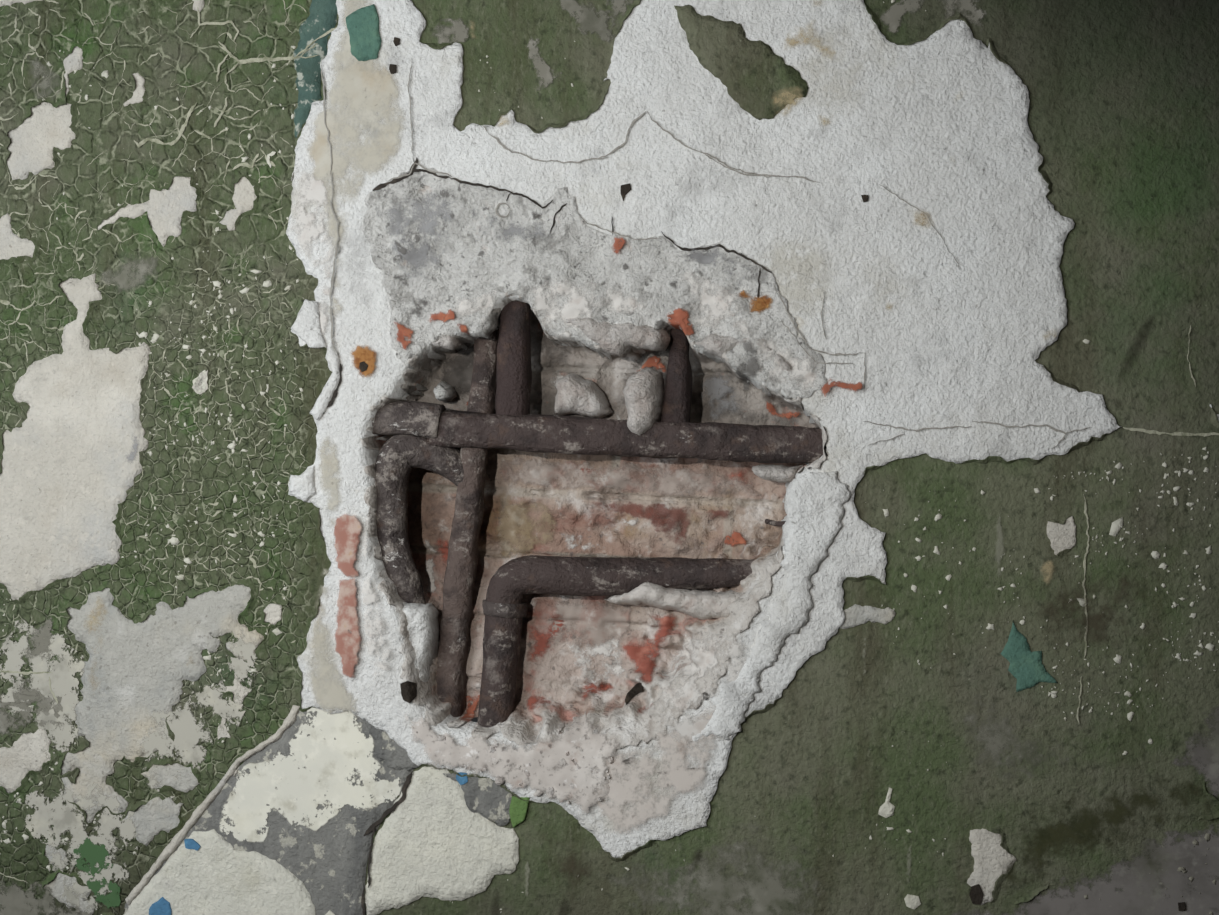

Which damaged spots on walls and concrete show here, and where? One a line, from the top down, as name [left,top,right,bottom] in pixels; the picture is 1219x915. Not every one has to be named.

peeling [5,43,109,180]
peeling [96,168,201,260]
peeling [214,134,273,235]
crack [373,64,866,390]
crack [881,185,959,268]
crack [0,0,342,741]
crack [1187,325,1196,387]
peeling [0,274,162,616]
crack [863,421,1090,449]
crack [1123,427,1219,437]
peeling [0,579,287,915]
peeling [952,826,1017,915]